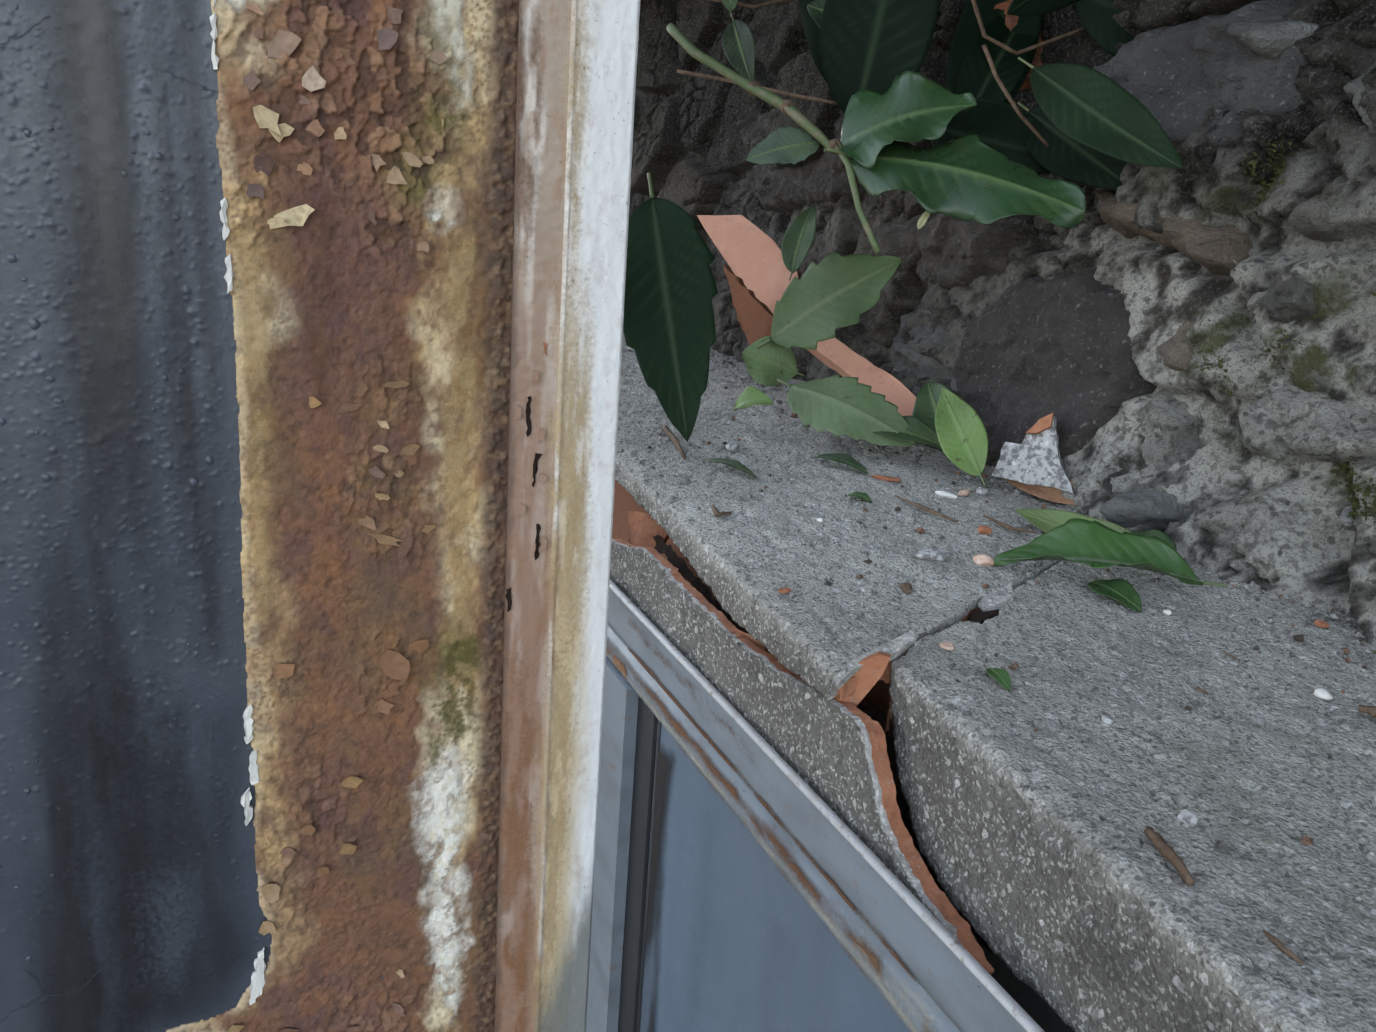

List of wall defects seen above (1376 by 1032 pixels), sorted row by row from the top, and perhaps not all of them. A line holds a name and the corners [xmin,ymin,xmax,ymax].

peeling [210,0,219,70]
peeling [219,197,234,294]
rust [166,0,538,1032]
crack [652,535,771,654]
peeling [241,704,260,826]
rust [535,687,569,999]
rust [606,642,858,916]
crack [856,700,994,953]
peeling [249,948,266,1005]
rust [848,932,915,981]